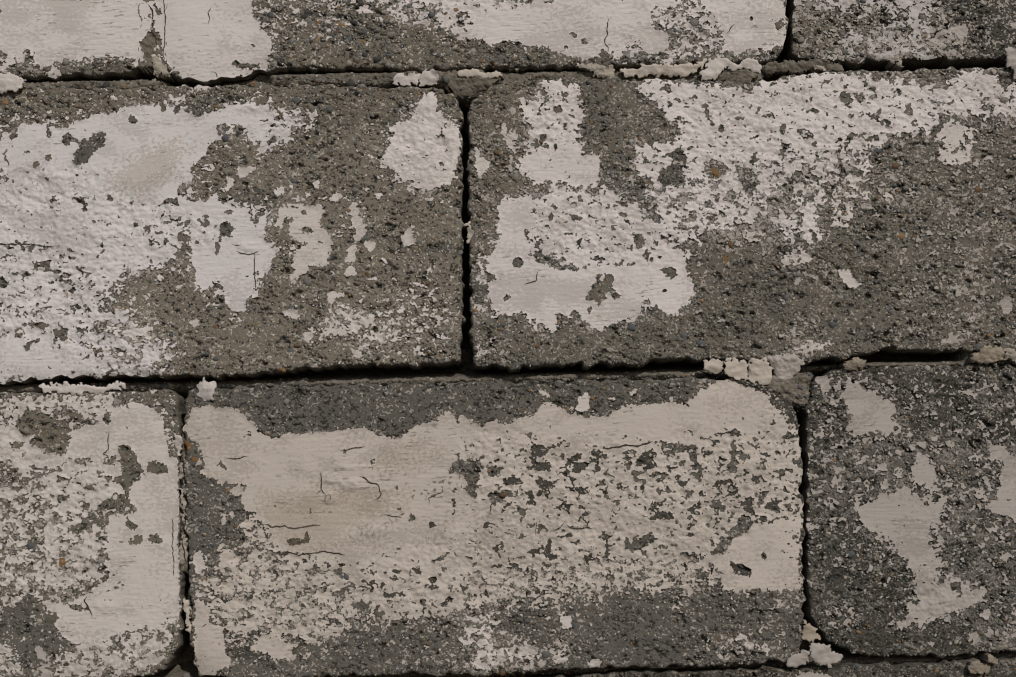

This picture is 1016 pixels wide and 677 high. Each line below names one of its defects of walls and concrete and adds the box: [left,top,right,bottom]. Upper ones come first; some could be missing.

peeling [0,381,184,677]
peeling [182,357,1016,677]